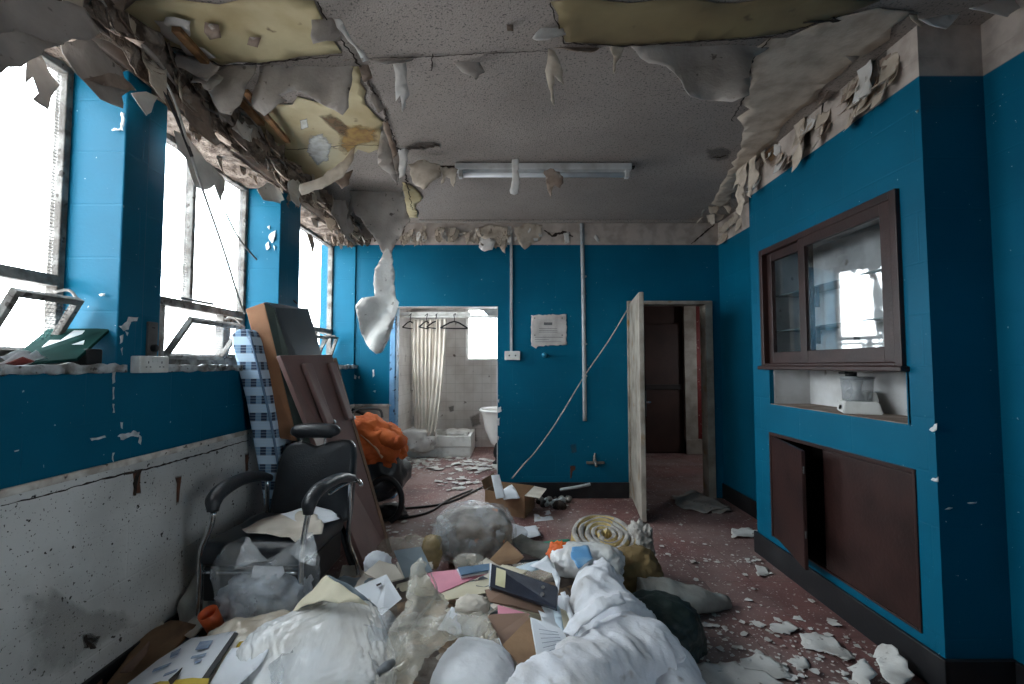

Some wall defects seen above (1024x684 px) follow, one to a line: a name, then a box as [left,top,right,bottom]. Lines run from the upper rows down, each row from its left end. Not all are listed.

damp [321,116,375,152]
peeling [691,0,1021,245]
spalling [0,0,573,355]
spalling [90,372,142,445]
rust [133,469,143,496]